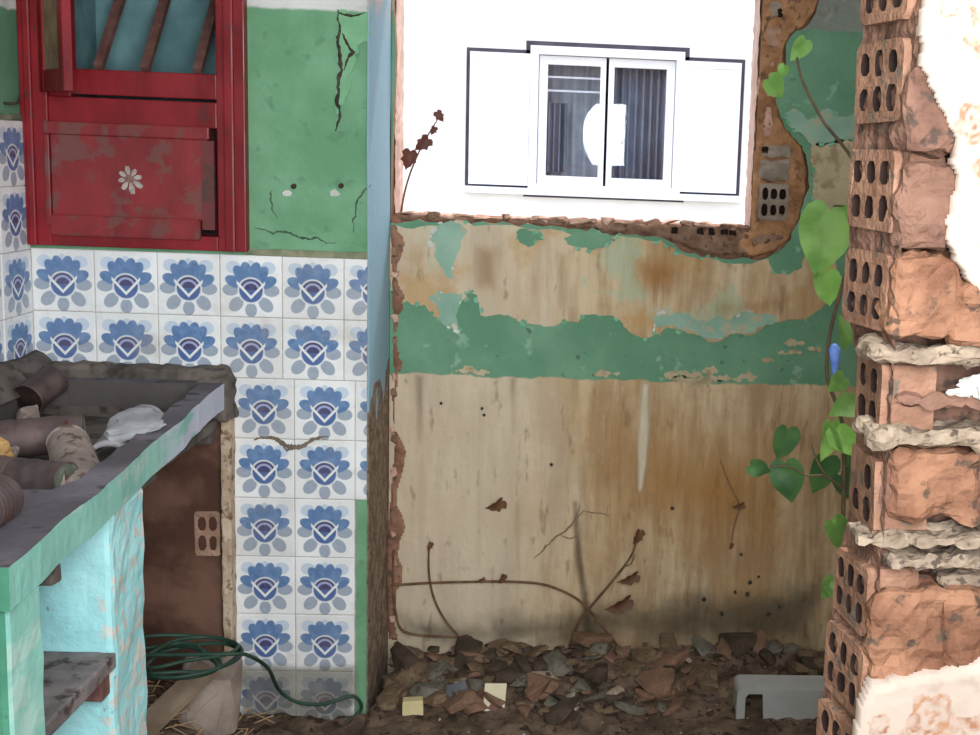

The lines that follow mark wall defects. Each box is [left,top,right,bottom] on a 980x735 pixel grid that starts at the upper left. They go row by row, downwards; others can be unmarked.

flaking render [387,0,980,735]
leakage [638,383,649,490]
leakage [542,593,810,635]